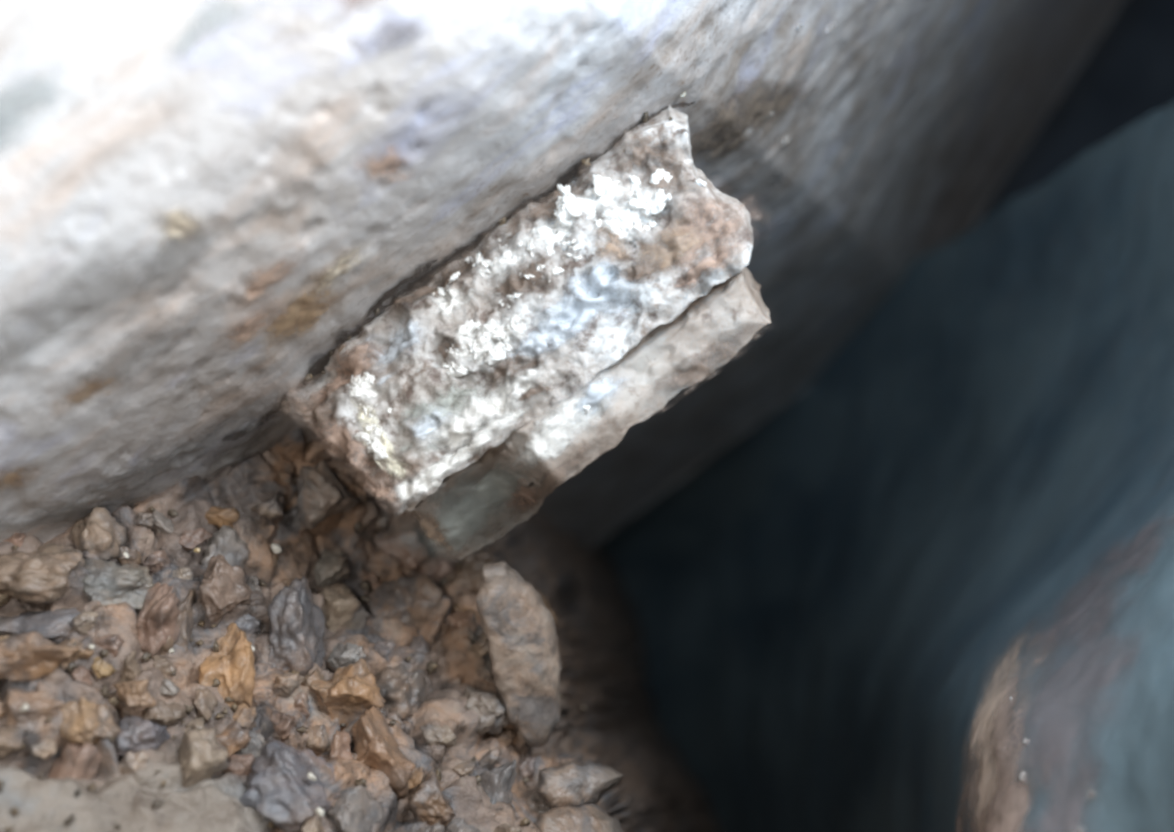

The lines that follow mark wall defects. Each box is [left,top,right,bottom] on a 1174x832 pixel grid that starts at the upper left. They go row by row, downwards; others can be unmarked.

crack [222,101,696,441]
leakage [349,168,675,550]